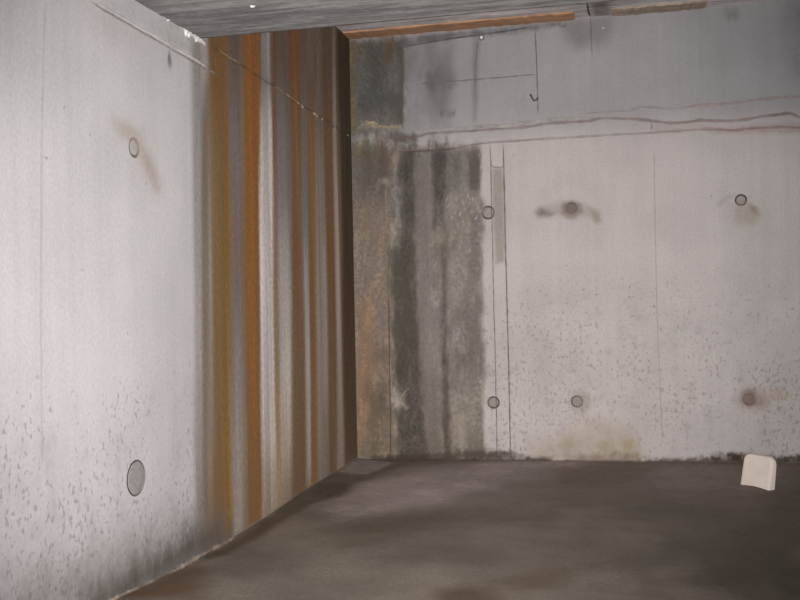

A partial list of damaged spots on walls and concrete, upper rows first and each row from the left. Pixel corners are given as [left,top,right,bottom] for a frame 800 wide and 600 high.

corrosion [204,26,397,553]
leakage [349,36,551,461]